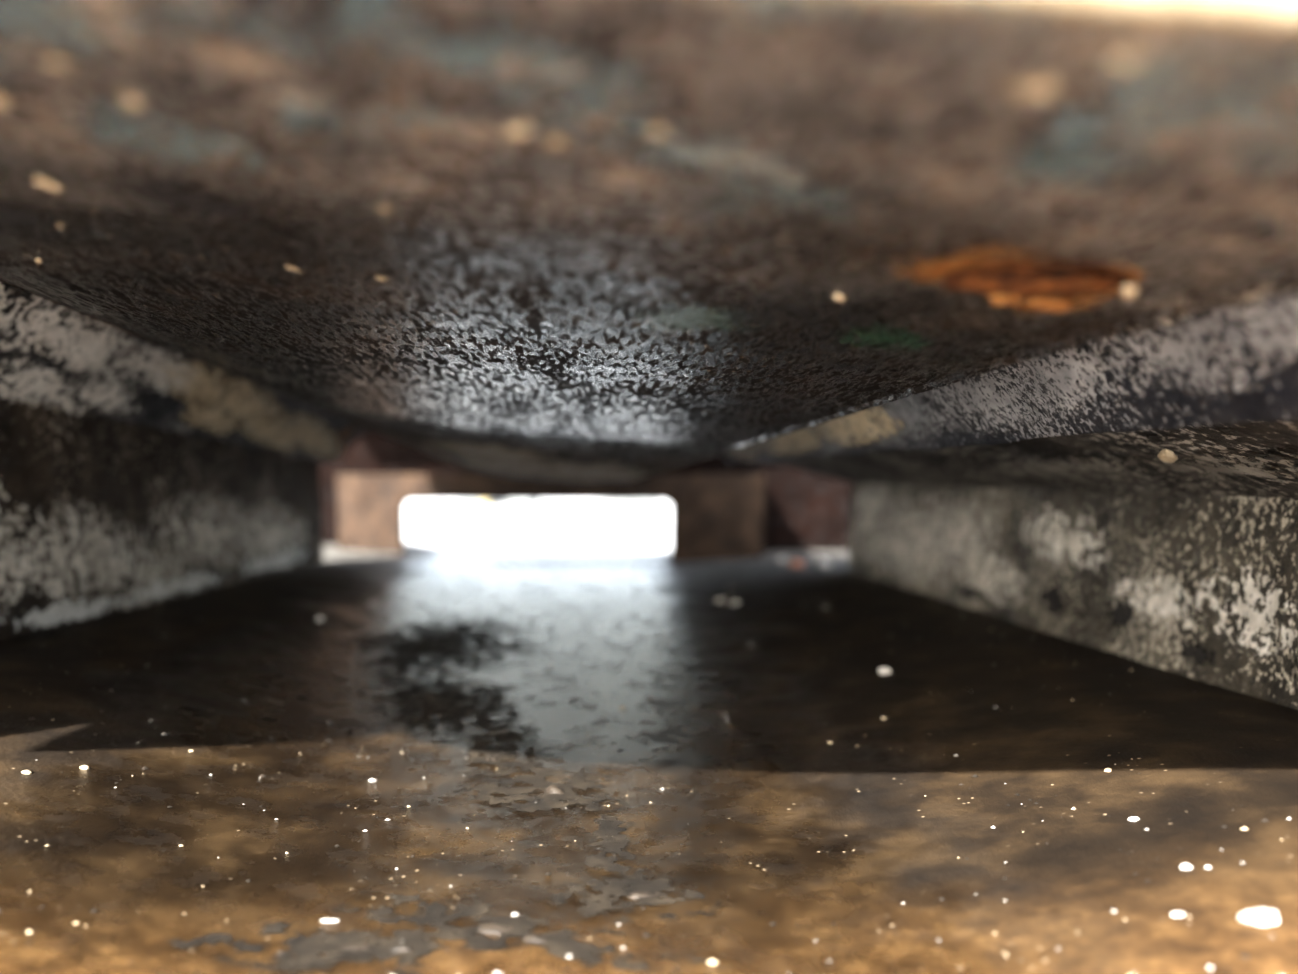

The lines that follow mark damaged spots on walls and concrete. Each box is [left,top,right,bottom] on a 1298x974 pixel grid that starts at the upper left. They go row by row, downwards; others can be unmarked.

leakage [0,281,346,459]
leakage [0,483,311,632]
leakage [845,482,1028,608]
leakage [1019,503,1111,573]
leakage [1113,563,1298,656]